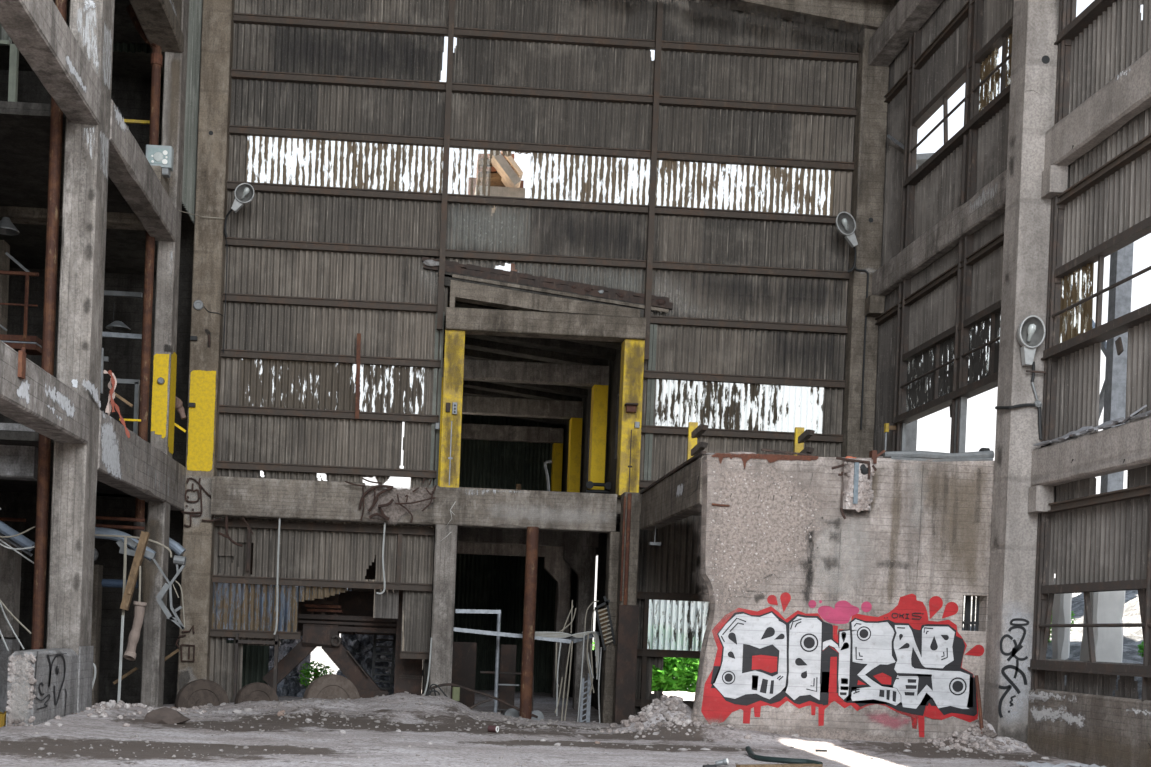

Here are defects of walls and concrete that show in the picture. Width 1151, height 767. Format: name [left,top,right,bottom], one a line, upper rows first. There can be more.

peeling [17,380,30,404]
peeling [45,348,121,480]
rust [712,453,819,469]
leakage [804,532,813,600]